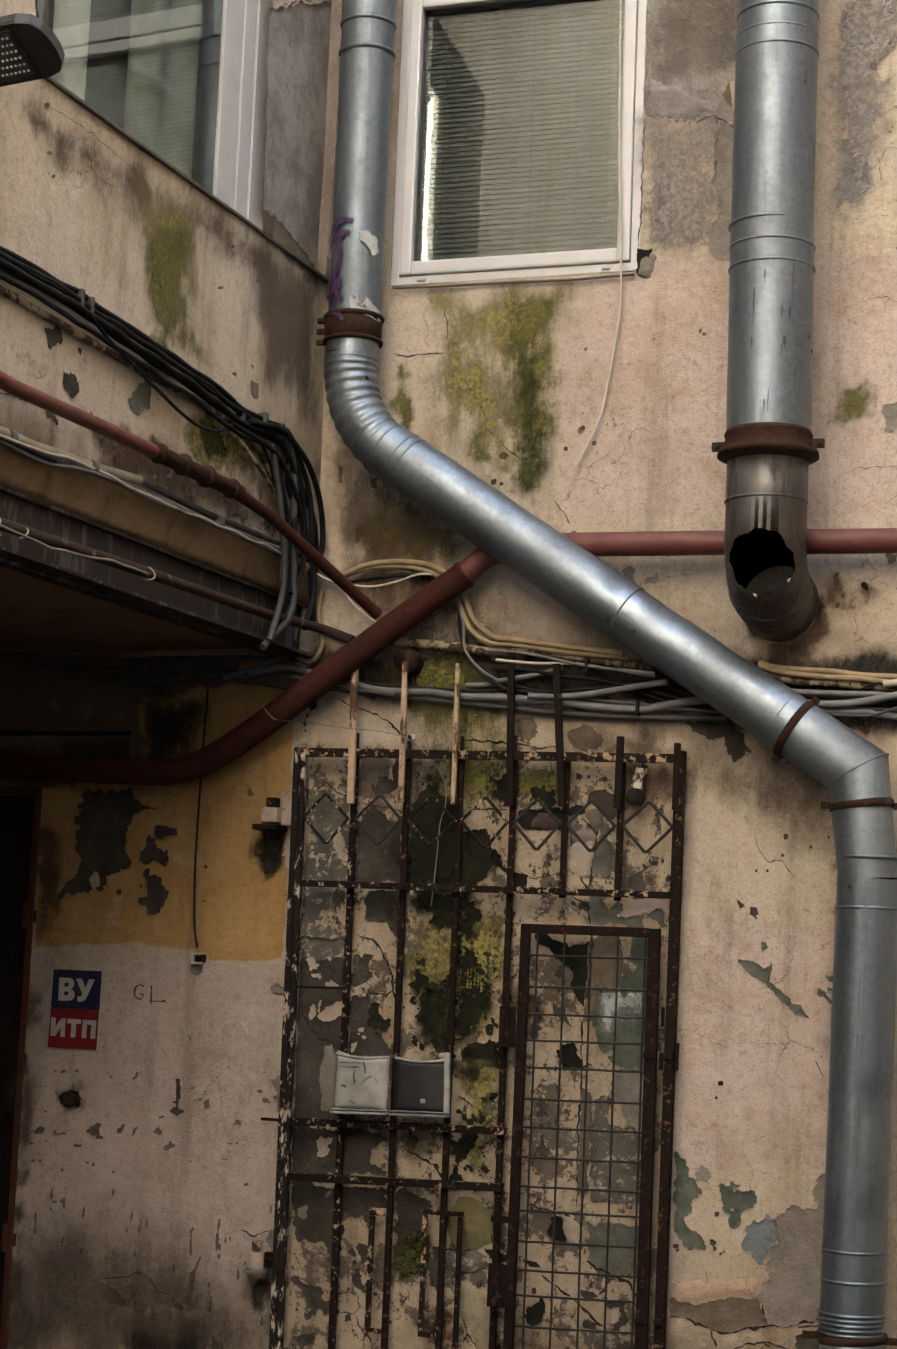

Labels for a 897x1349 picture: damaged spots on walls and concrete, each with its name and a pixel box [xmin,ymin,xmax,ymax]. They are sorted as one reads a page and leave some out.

leakage [29,111,95,166]
leakage [125,165,152,208]
flaking render [643,0,739,260]
leakage [146,208,316,417]
spalling [636,248,652,277]
leakage [502,298,556,494]
peeling [58,787,178,915]
leakage [14,1059,34,1147]
peeling [534,896,667,1203]
peeling [738,941,810,1019]
leakage [9,1207,263,1349]
peeling [651,1151,825,1349]